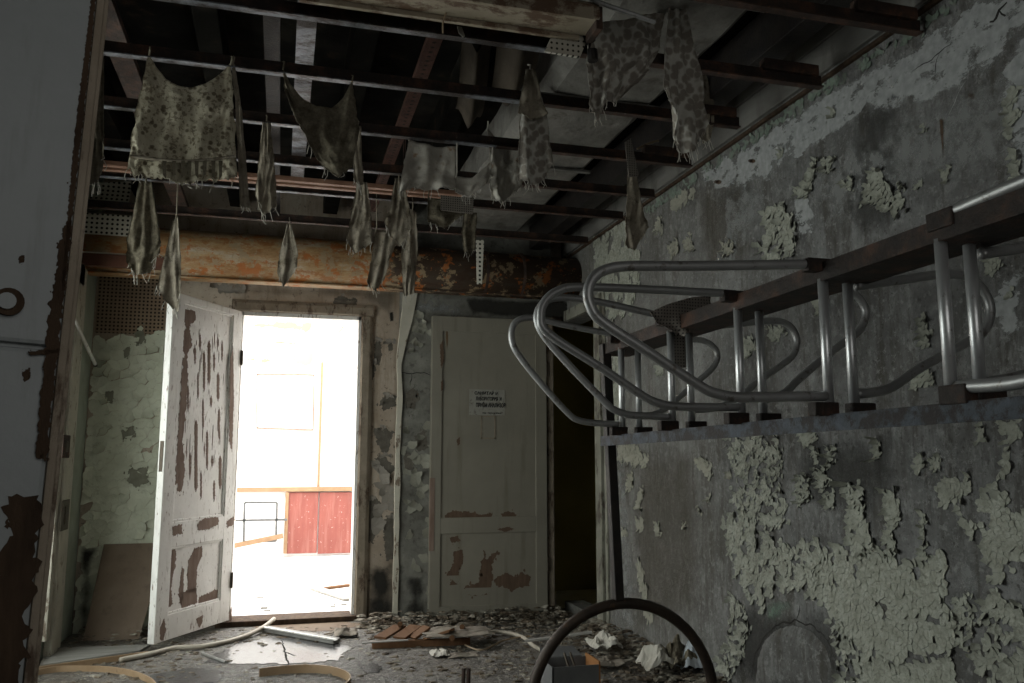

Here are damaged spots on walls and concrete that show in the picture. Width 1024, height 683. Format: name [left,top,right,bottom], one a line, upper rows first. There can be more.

peeling [645,0,957,260]
spalling [372,336,396,380]
peeling [408,310,445,391]
peeling [0,494,44,683]
peeling [72,326,165,634]
peeling [368,388,430,561]
peeling [617,444,663,538]
peeling [635,556,653,625]
peeling [694,419,1024,683]